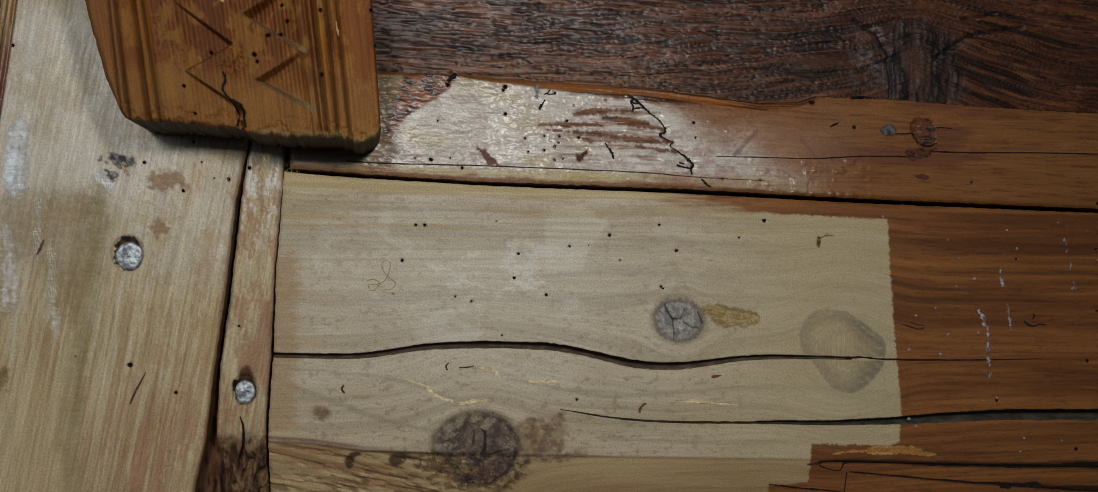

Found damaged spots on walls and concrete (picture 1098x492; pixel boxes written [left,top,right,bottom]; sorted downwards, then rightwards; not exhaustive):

crack [221,71,247,128]
crack [346,97,907,188]
crack [933,148,1098,156]
crack [273,340,1043,370]
crack [560,408,1098,425]
crack [769,460,1098,492]